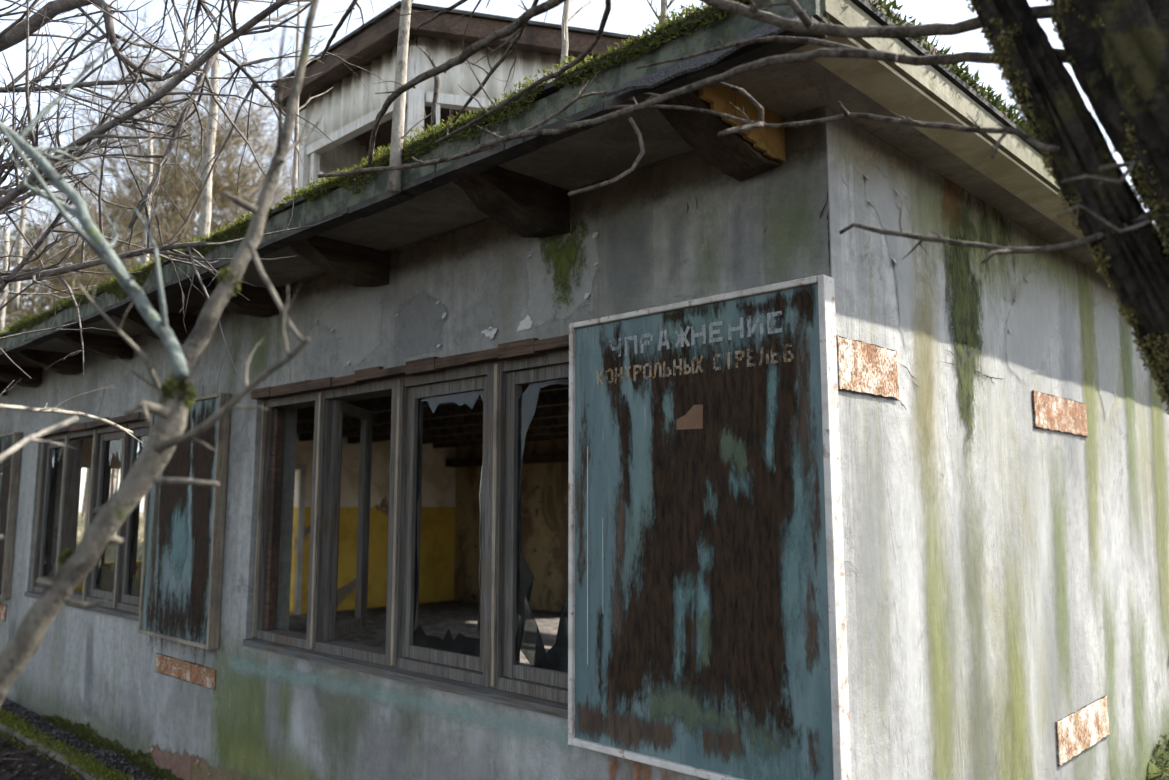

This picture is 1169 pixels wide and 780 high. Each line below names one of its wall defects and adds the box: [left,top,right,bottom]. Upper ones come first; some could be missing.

damp [1107,620,1117,779]
damp [1133,641,1144,741]